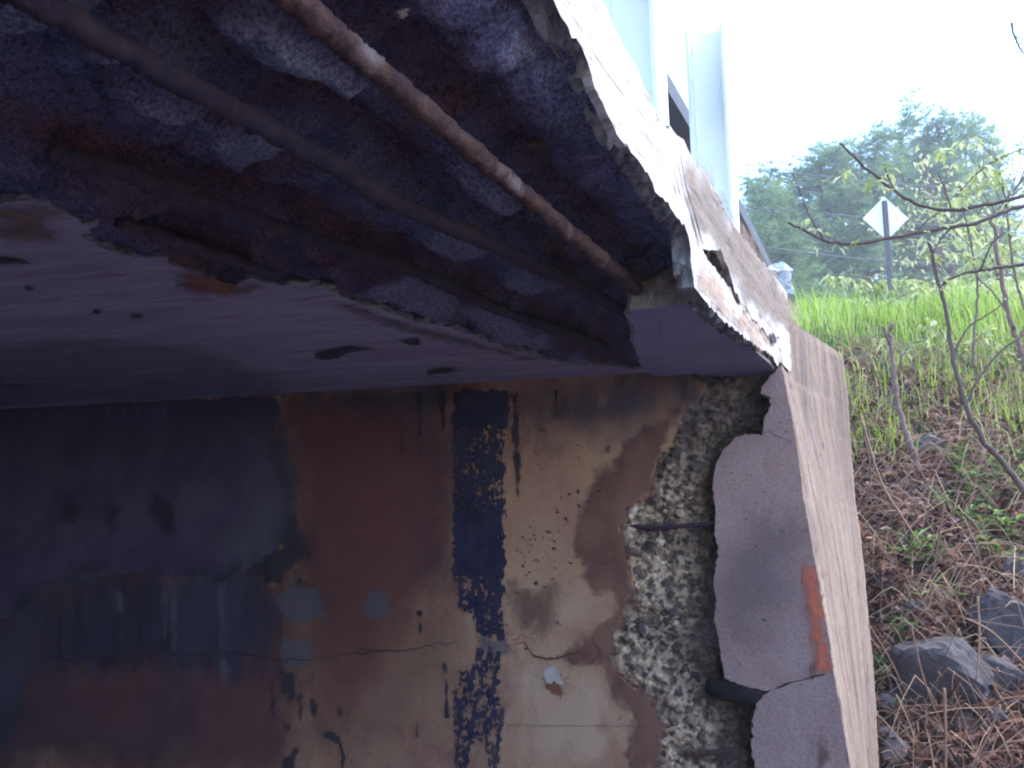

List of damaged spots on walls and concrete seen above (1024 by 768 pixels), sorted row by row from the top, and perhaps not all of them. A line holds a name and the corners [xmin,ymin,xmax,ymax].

spalling [0,0,674,368]
damp [538,375,657,422]
damp [0,434,317,749]
spalling [516,490,600,588]
spalling [610,374,772,768]
crack [505,634,590,662]
spalling [543,657,566,697]
damp [282,747,300,768]